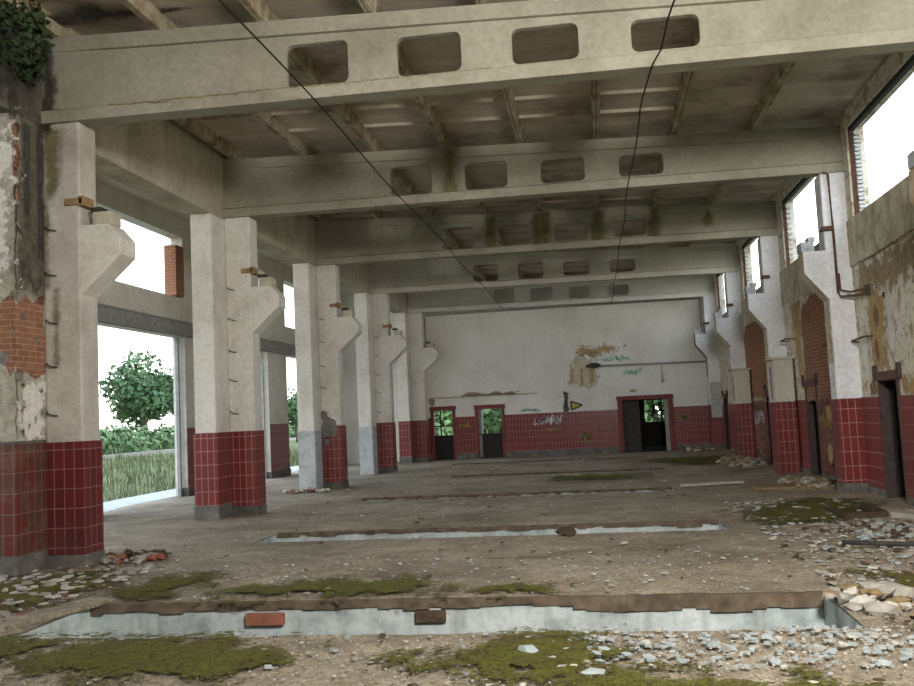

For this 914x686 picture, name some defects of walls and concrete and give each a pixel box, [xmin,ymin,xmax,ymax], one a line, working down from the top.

flaking render [0,106,26,284]
water stain [0,6,59,299]
flaking render [856,235,914,299]
flaking render [0,278,46,441]
peeling [567,343,626,389]